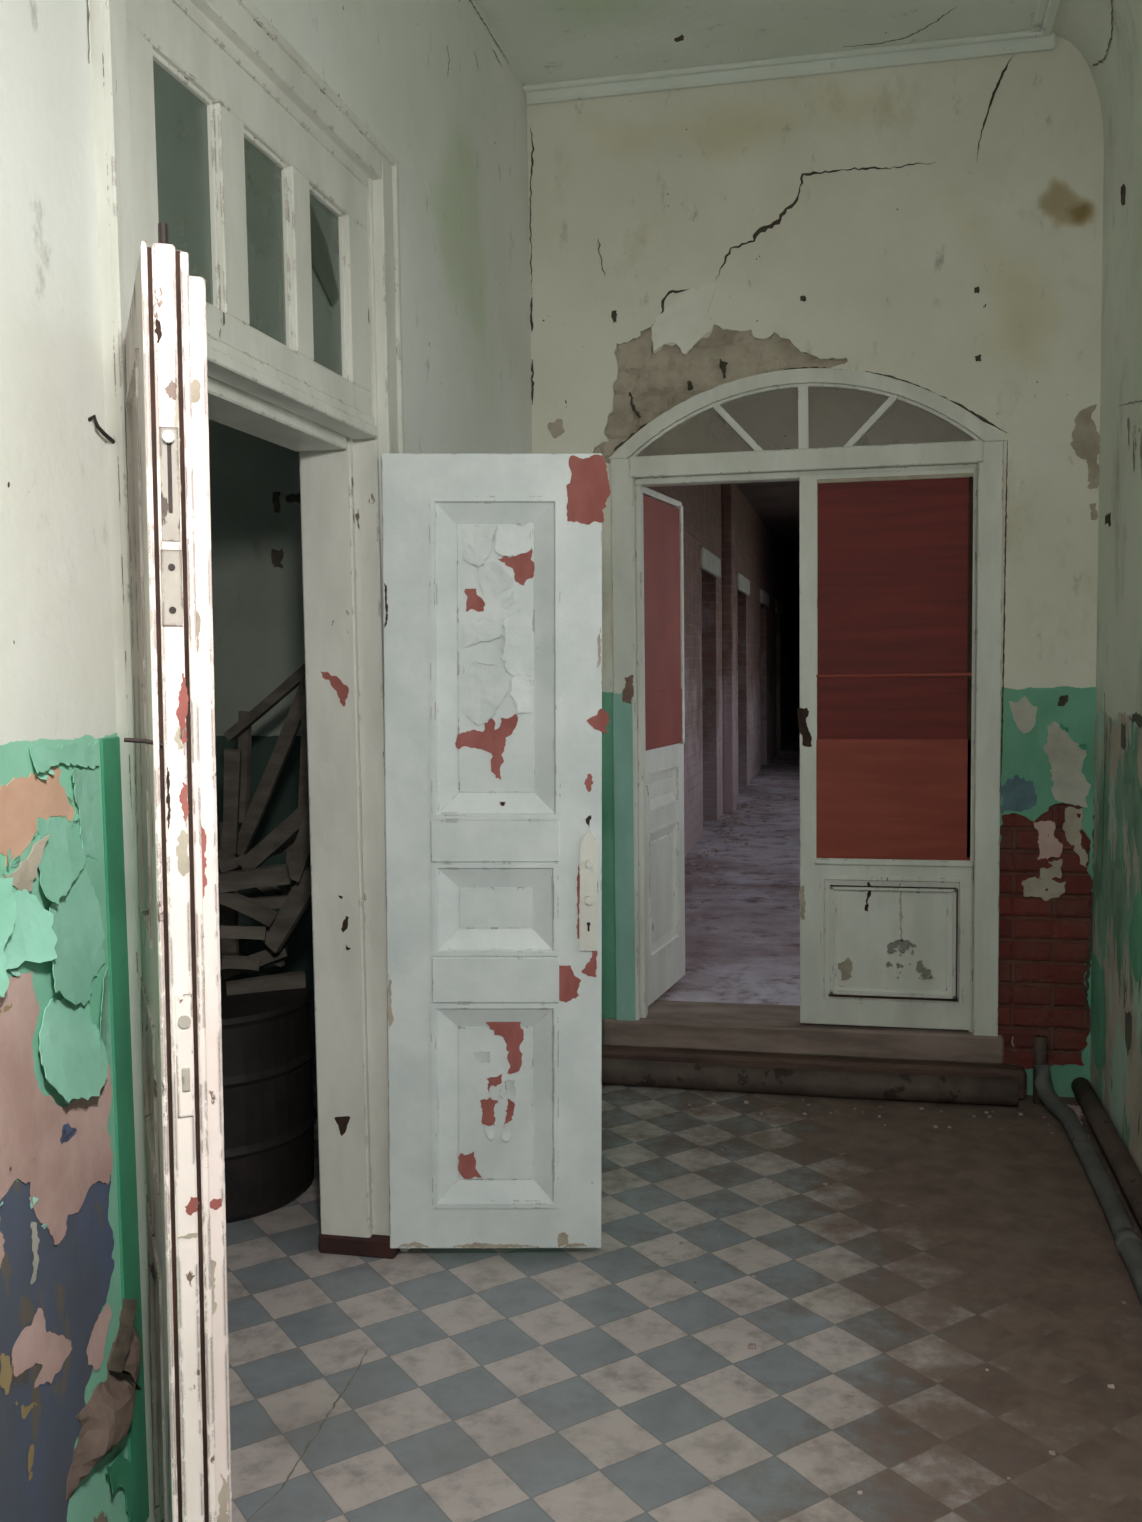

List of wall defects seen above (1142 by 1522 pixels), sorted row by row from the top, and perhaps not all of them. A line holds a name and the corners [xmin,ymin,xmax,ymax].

crack [447,0,508,71]
crack [977,55,1014,156]
crack [653,162,936,325]
spalling [594,283,848,464]
peeling [1070,404,1111,527]
peeling [1121,712,1142,750]
spalling [998,695,1106,1070]
peeling [0,741,114,1522]